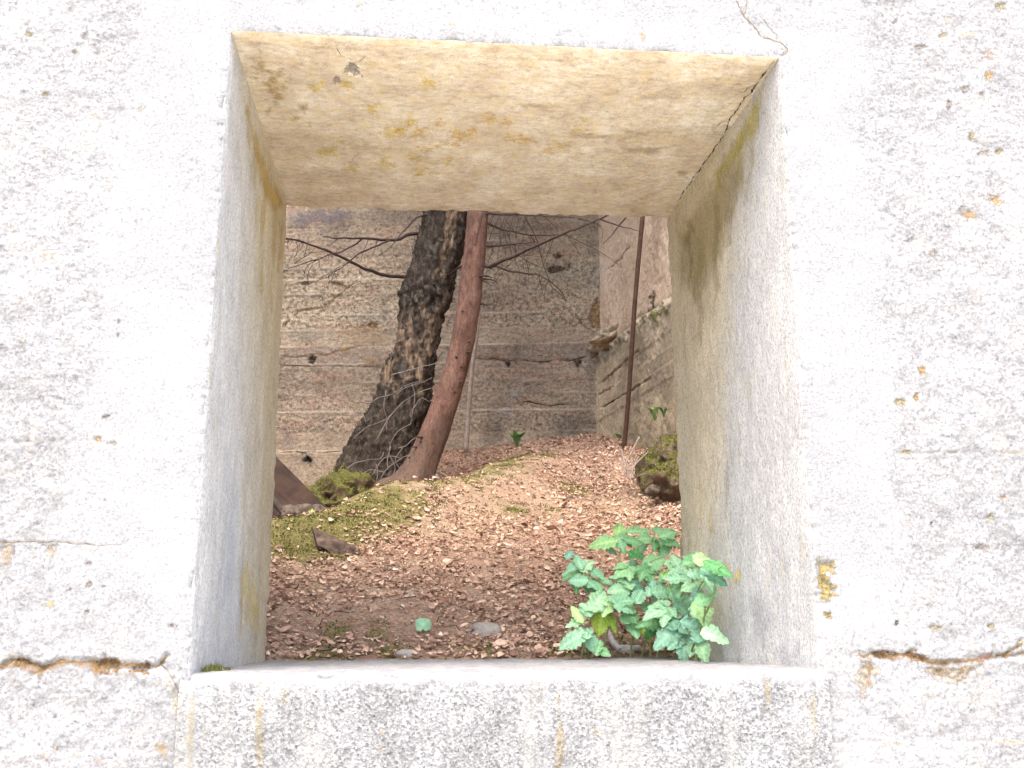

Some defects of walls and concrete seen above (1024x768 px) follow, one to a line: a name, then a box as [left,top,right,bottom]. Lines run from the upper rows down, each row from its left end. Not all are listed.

crack [0,655,179,693]
crack [843,604,1024,694]